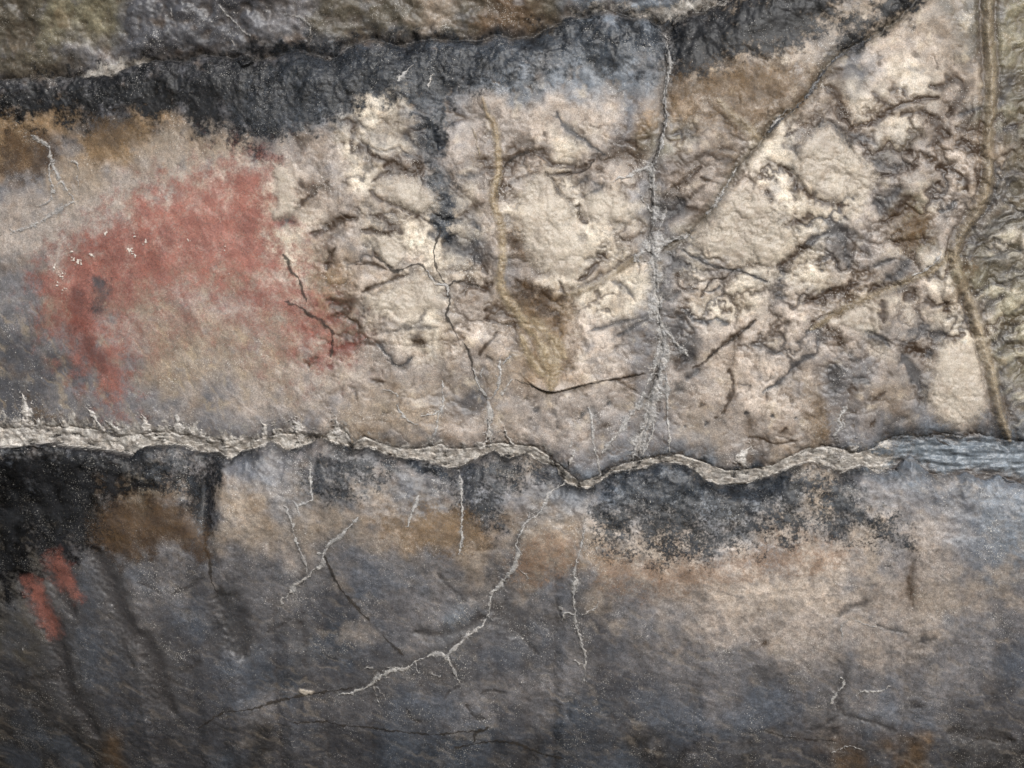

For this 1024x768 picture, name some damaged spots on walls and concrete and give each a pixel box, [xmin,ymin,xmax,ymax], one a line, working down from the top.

crack [767,18,900,133]
crack [496,151,530,198]
crack [515,28,766,463]
crack [874,434,969,449]
crack [324,555,403,655]